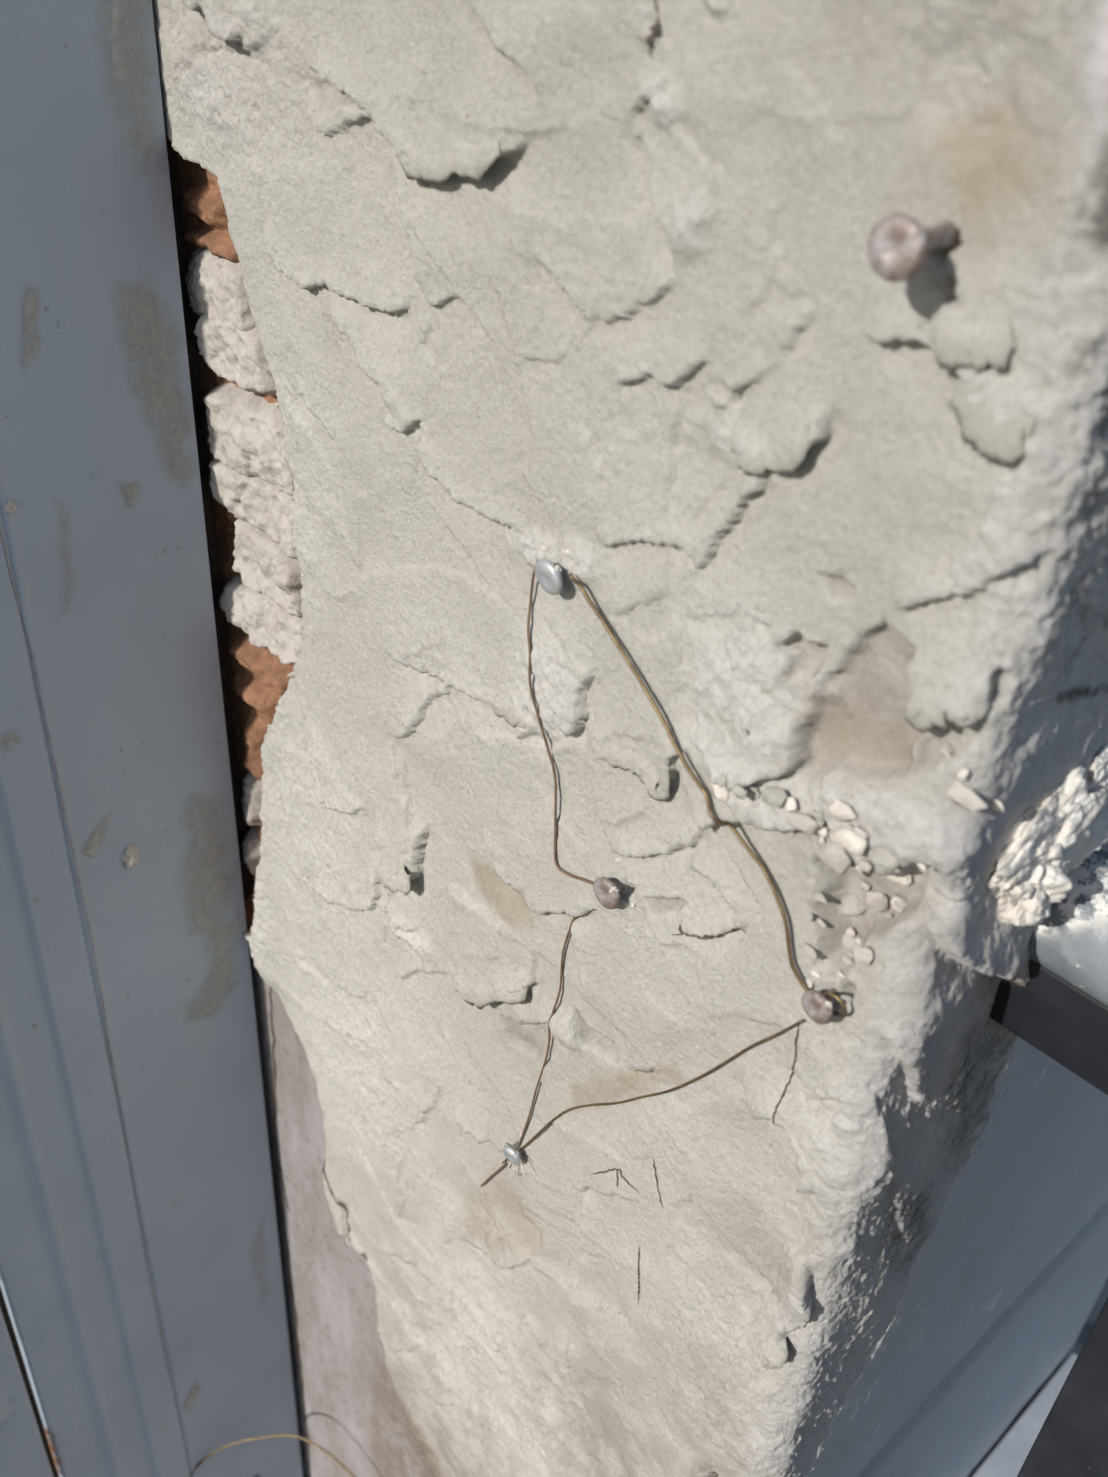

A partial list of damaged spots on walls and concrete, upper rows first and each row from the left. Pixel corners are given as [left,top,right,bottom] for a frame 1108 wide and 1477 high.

spalling [172,147,303,937]
damp [1093,150,1108,242]